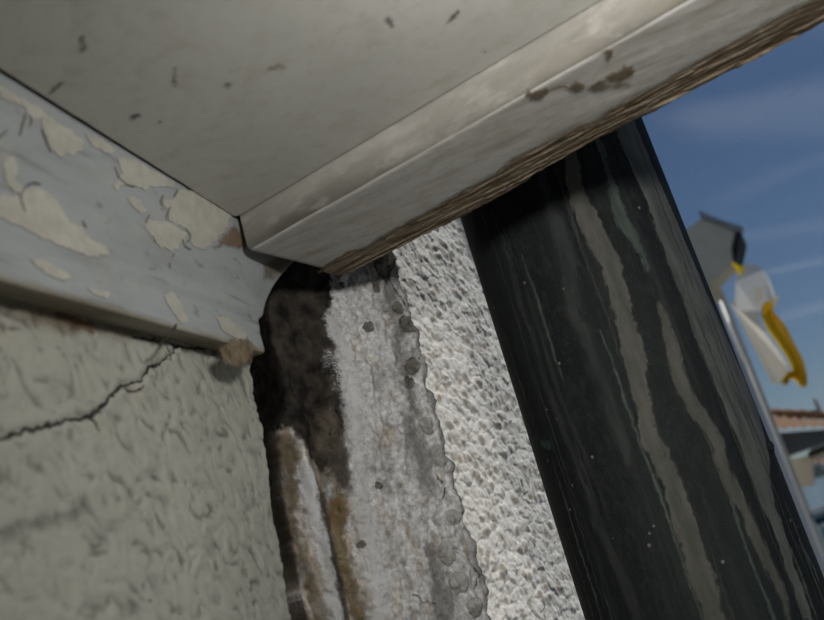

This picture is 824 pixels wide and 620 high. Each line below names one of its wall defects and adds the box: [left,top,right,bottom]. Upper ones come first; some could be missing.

peeling [0,84,232,268]
peeling [321,0,824,293]
crack [0,324,206,440]
spalling [392,301,417,332]
spalling [404,357,421,388]